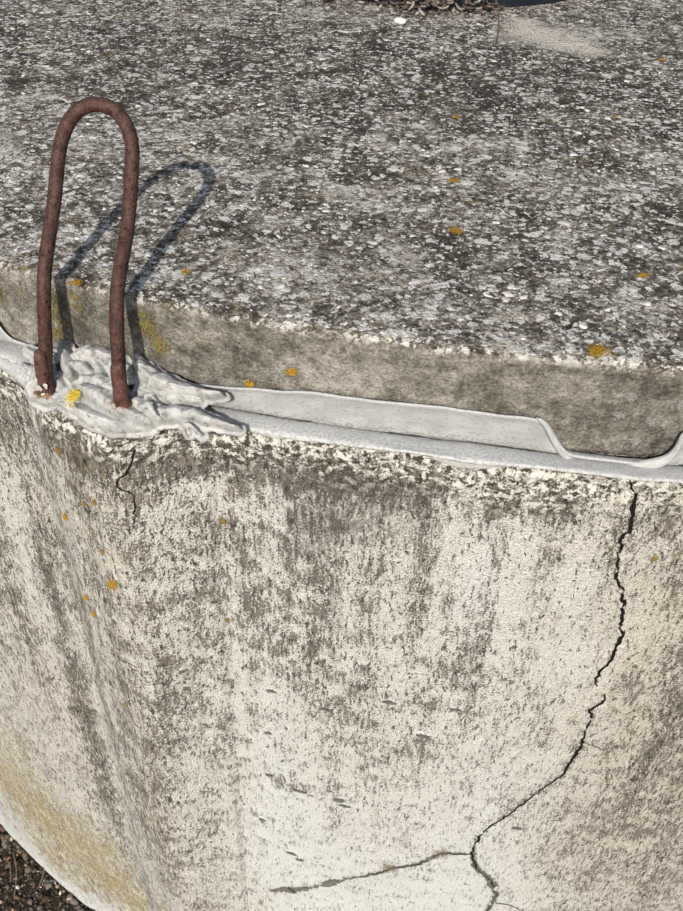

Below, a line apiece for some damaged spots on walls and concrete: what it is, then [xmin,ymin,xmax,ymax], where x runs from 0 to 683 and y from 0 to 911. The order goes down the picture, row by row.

crack [83,450,136,535]
crack [270,480,640,911]